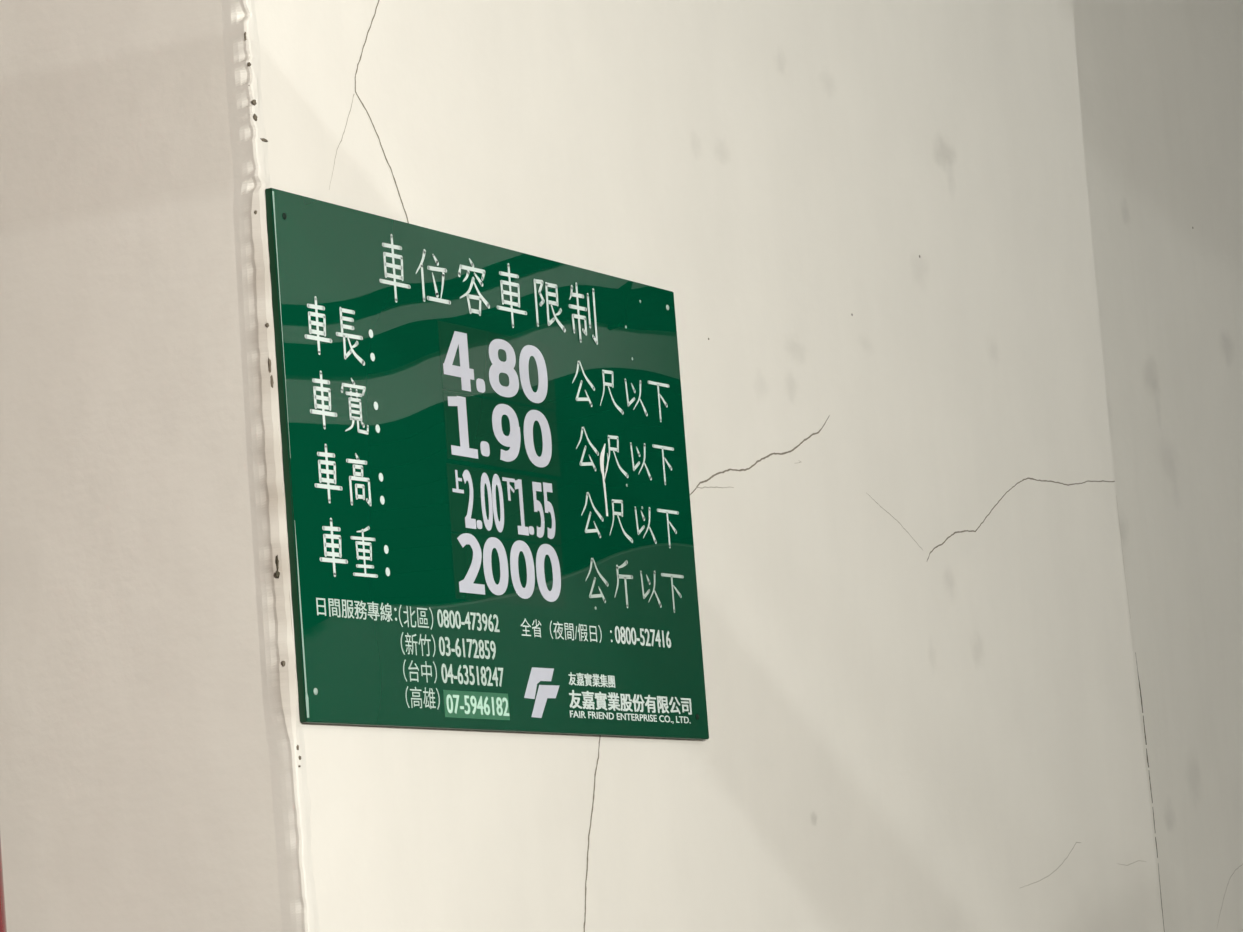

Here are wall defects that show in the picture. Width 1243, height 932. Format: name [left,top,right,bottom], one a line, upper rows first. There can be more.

crack [329,0,409,223]
crack [690,415,830,495]
crack [869,478,1131,619]
crack [584,735,601,932]
crack [1117,652,1165,932]